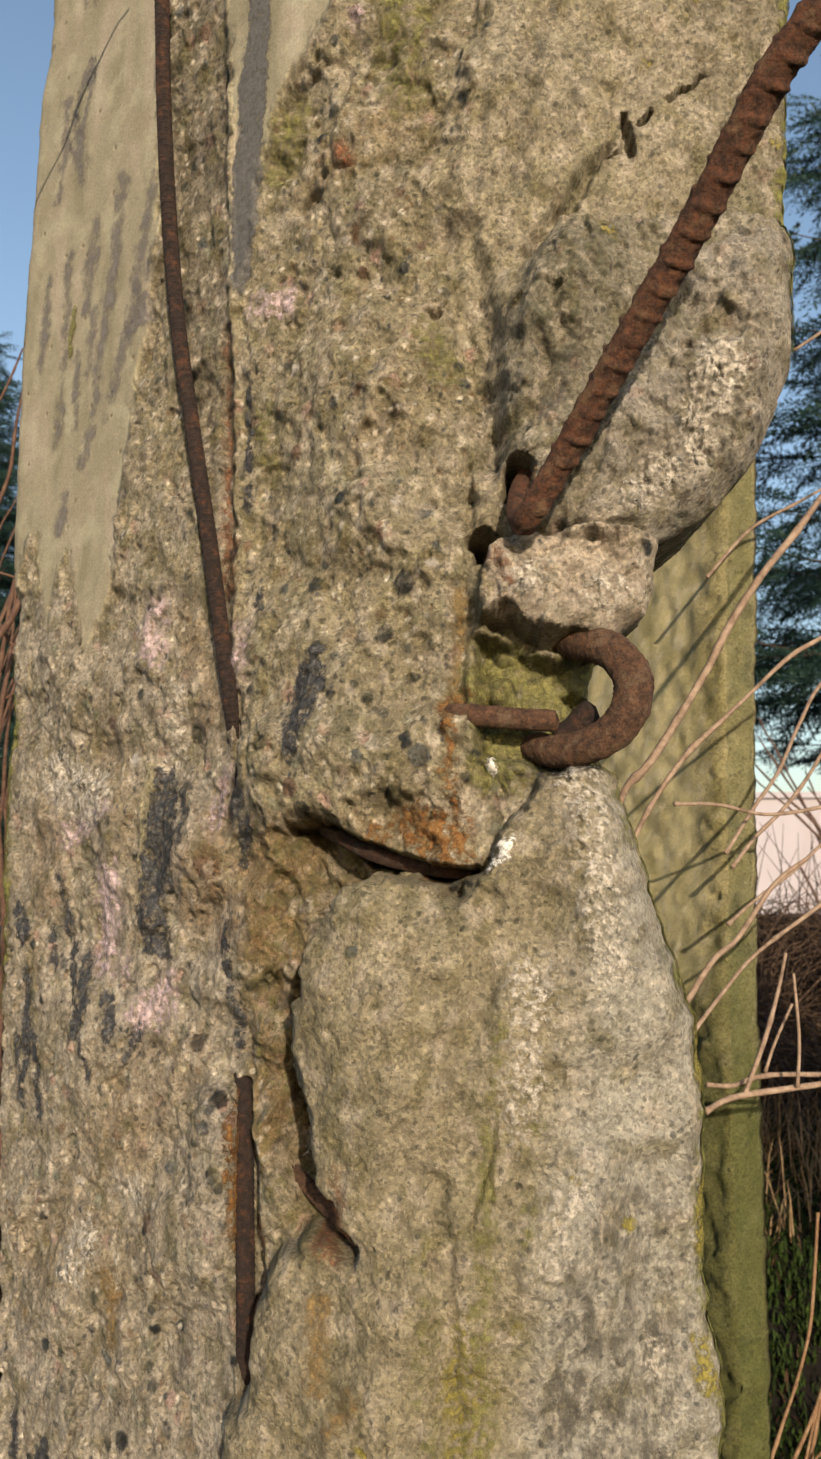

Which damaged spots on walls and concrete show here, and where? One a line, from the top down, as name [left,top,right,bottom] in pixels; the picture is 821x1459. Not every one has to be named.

spalling [506,0,821,536]
corrosion [220,338,235,601]
spalling [0,0,600,1459]
corrosion [366,588,498,882]
corrosion [222,1089,239,1248]